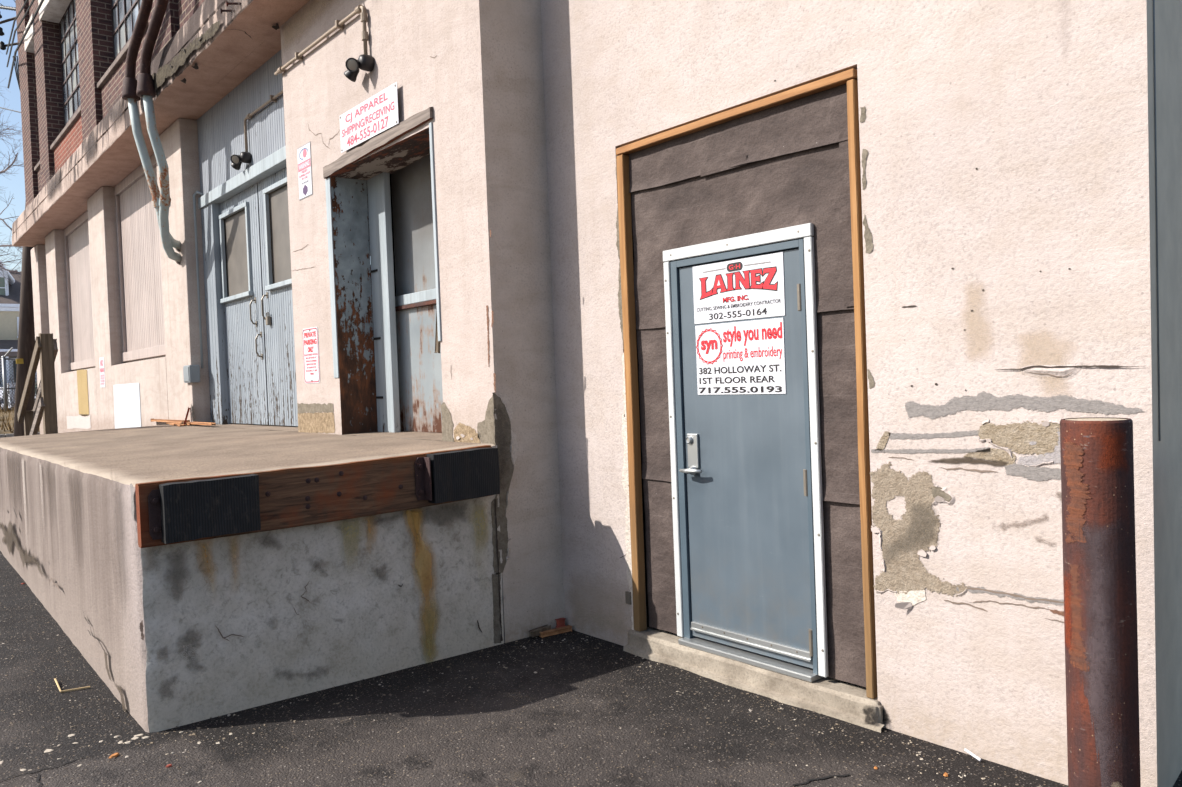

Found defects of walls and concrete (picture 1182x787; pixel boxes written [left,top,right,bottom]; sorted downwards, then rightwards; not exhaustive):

crack [994,363,1139,371]
damp [0,507,45,575]
rust [406,510,435,659]
spalling [870,419,1061,609]